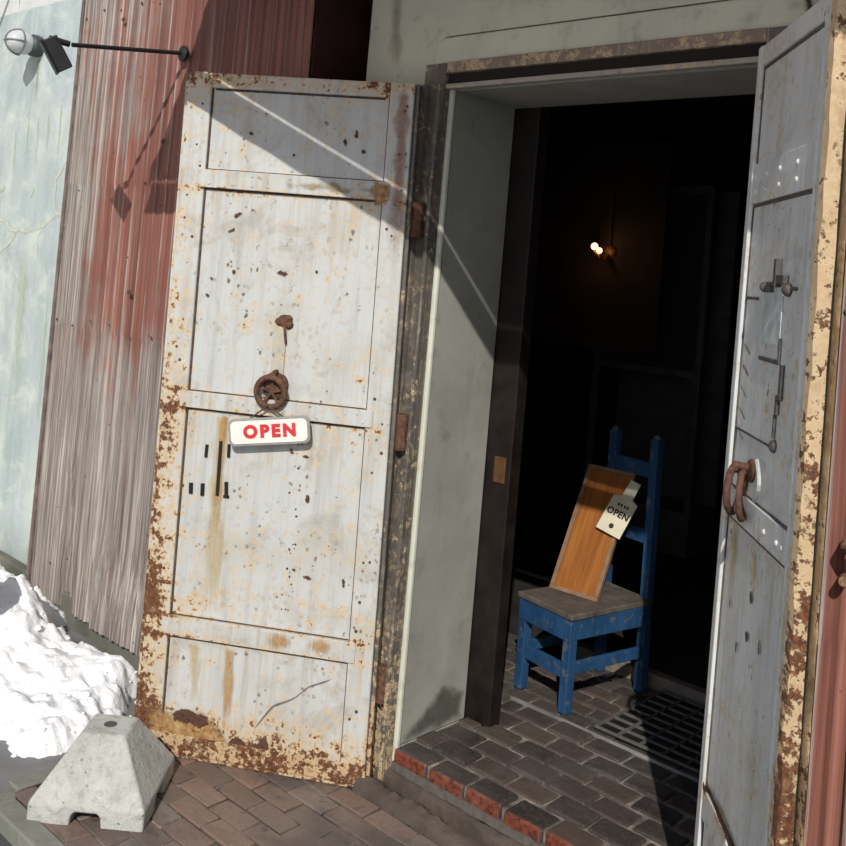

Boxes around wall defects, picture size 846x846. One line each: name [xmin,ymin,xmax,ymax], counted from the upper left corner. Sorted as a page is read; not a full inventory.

crack [0,162,66,253]
corrosion [149,708,224,742]
corrosion [224,651,232,714]
crack [256,679,331,726]